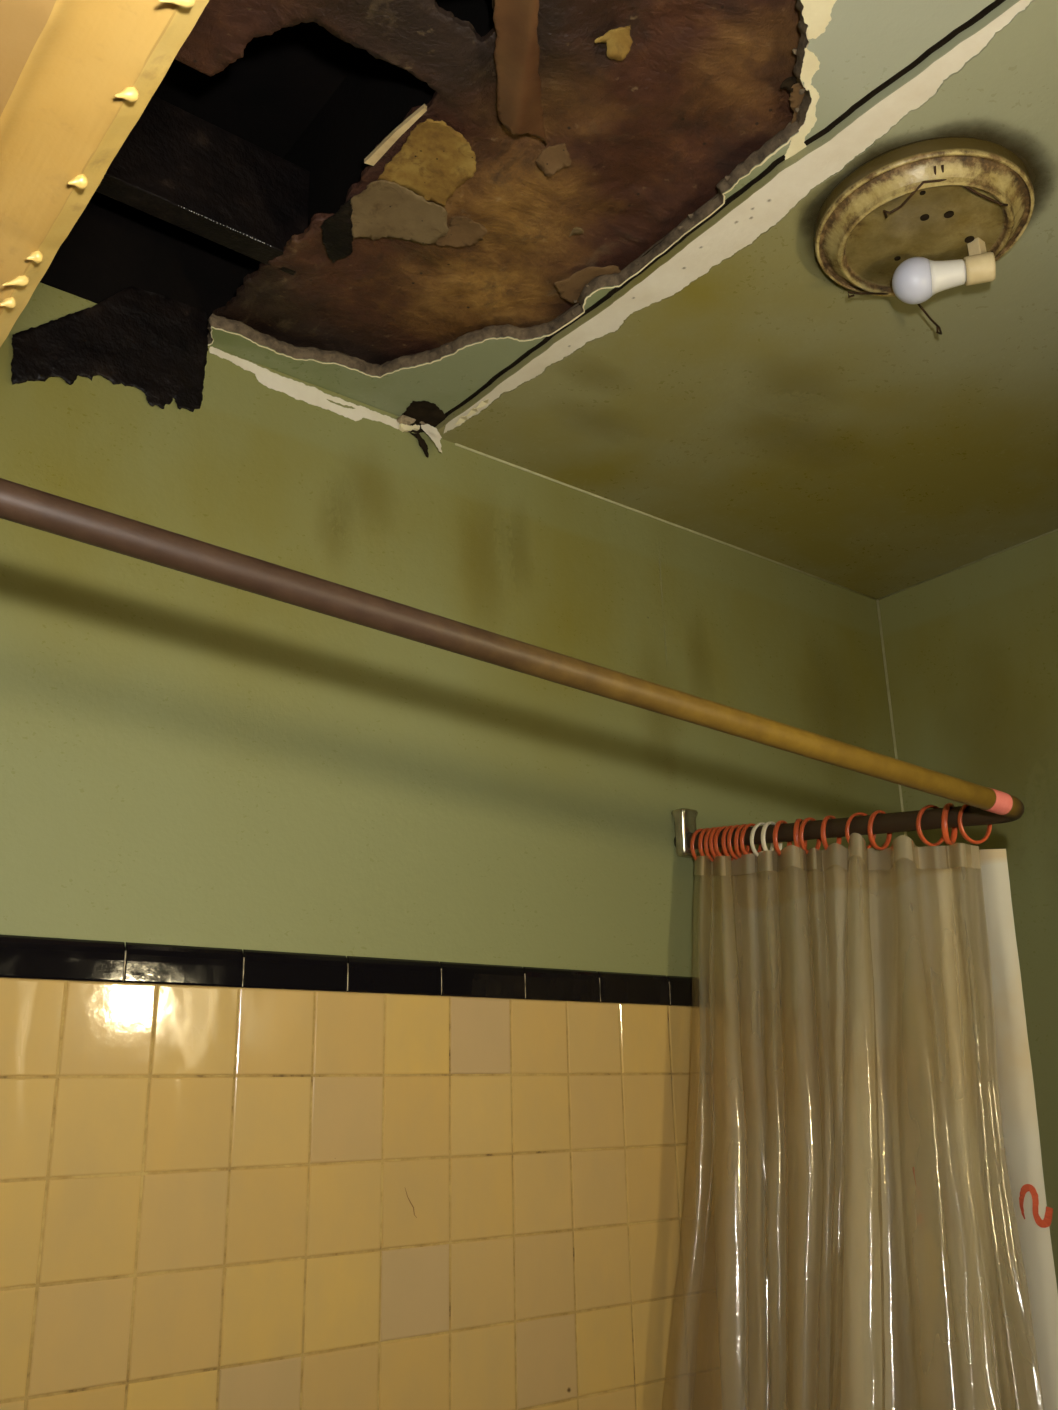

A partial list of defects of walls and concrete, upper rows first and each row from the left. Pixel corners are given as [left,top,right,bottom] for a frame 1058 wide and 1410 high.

peeling [207,0,1035,457]